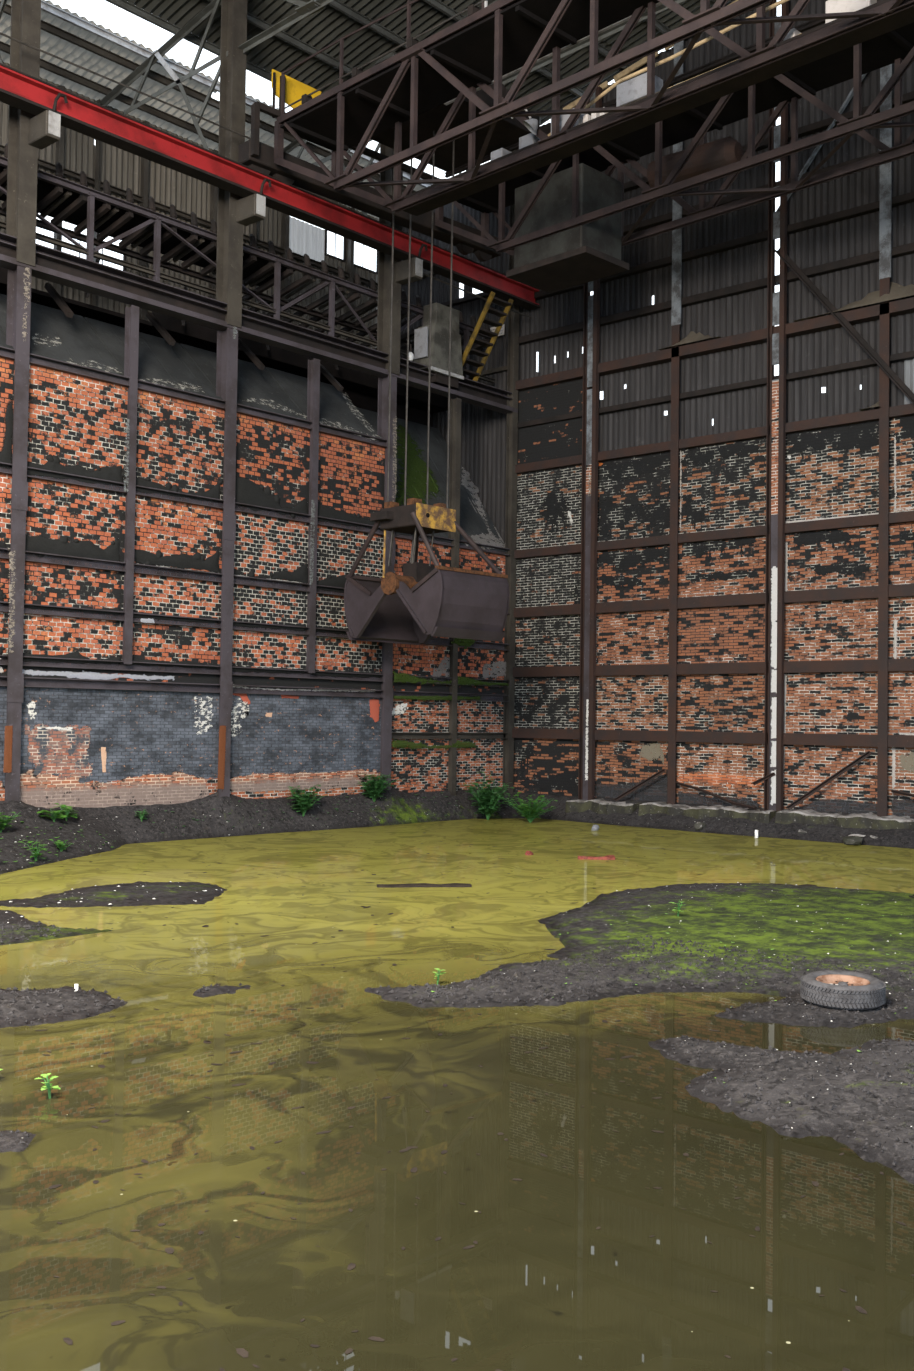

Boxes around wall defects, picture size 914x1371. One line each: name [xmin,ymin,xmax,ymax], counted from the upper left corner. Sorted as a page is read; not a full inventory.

peeling [369,699,408,722]
corrosion [3,726,13,773]
spalling [20,701,209,808]
corrosion [217,725,226,790]
spalling [230,769,379,793]